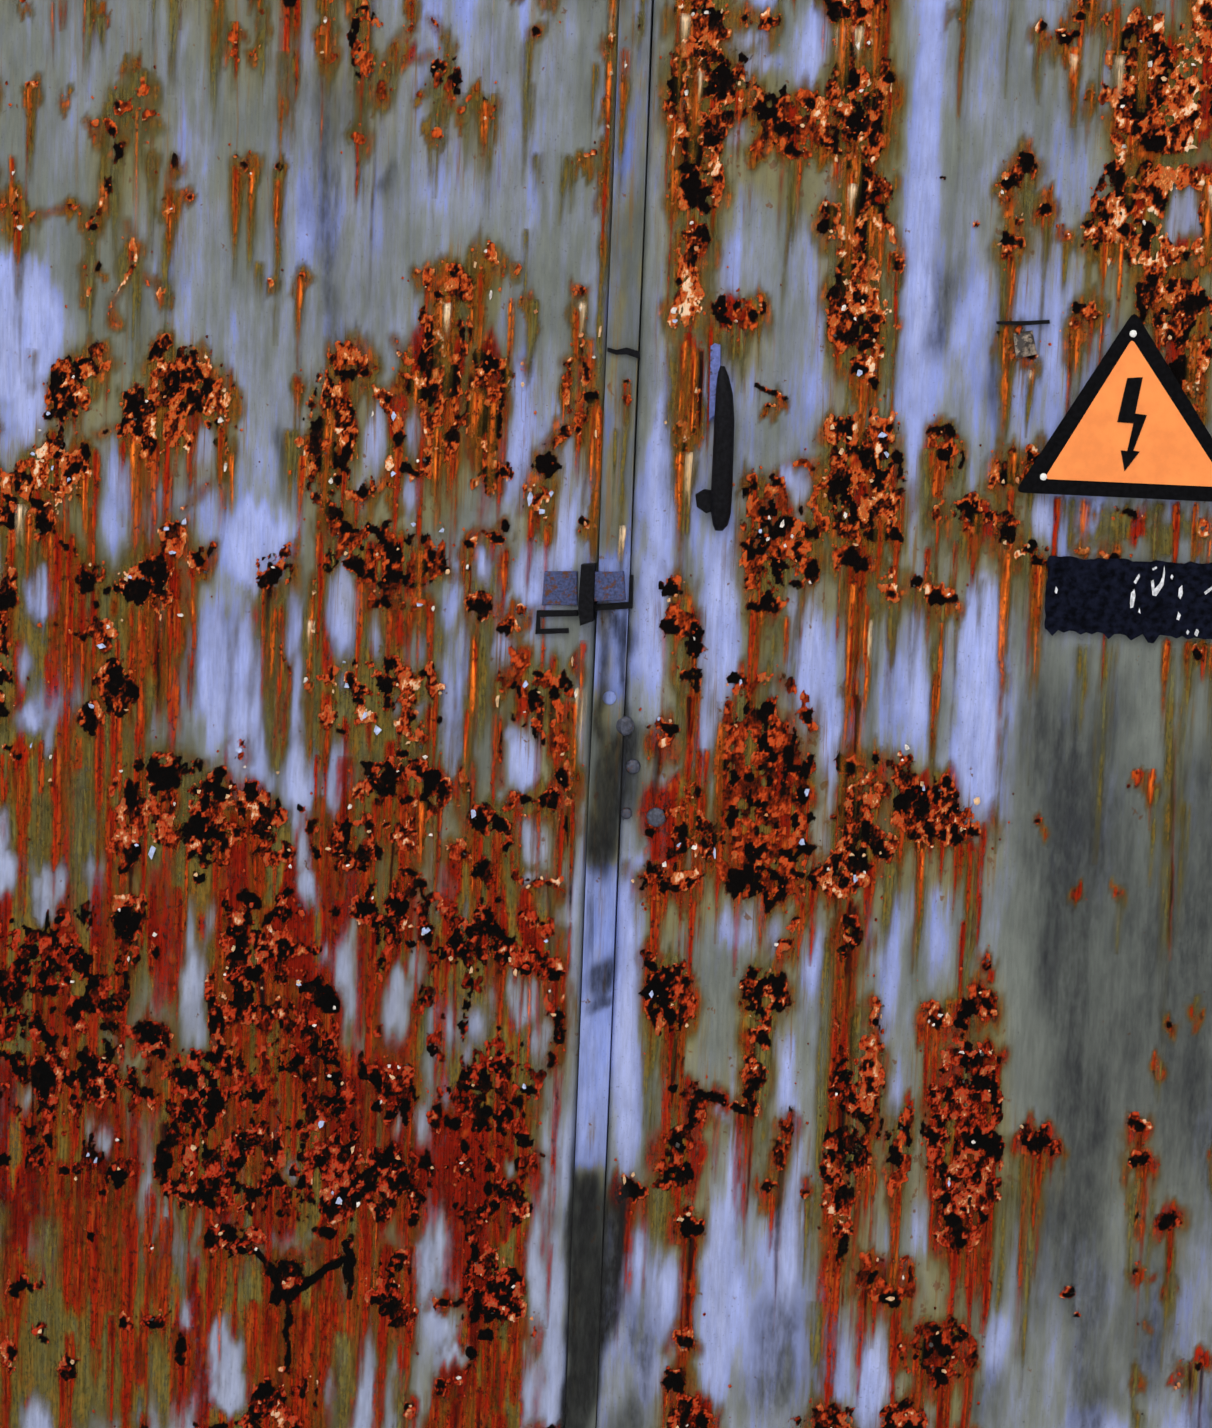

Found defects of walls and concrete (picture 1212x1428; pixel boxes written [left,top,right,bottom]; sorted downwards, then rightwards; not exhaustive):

corrosion [18,0,32,21]
corrosion [0,73,104,293]
corrosion [51,0,66,29]
corrosion [83,0,181,188]
corrosion [210,0,273,109]
corrosion [312,0,500,210]
corrosion [511,0,558,145]
corrosion [0,152,632,1428]
corrosion [608,0,1212,1428]
crack [253,1226,358,1368]